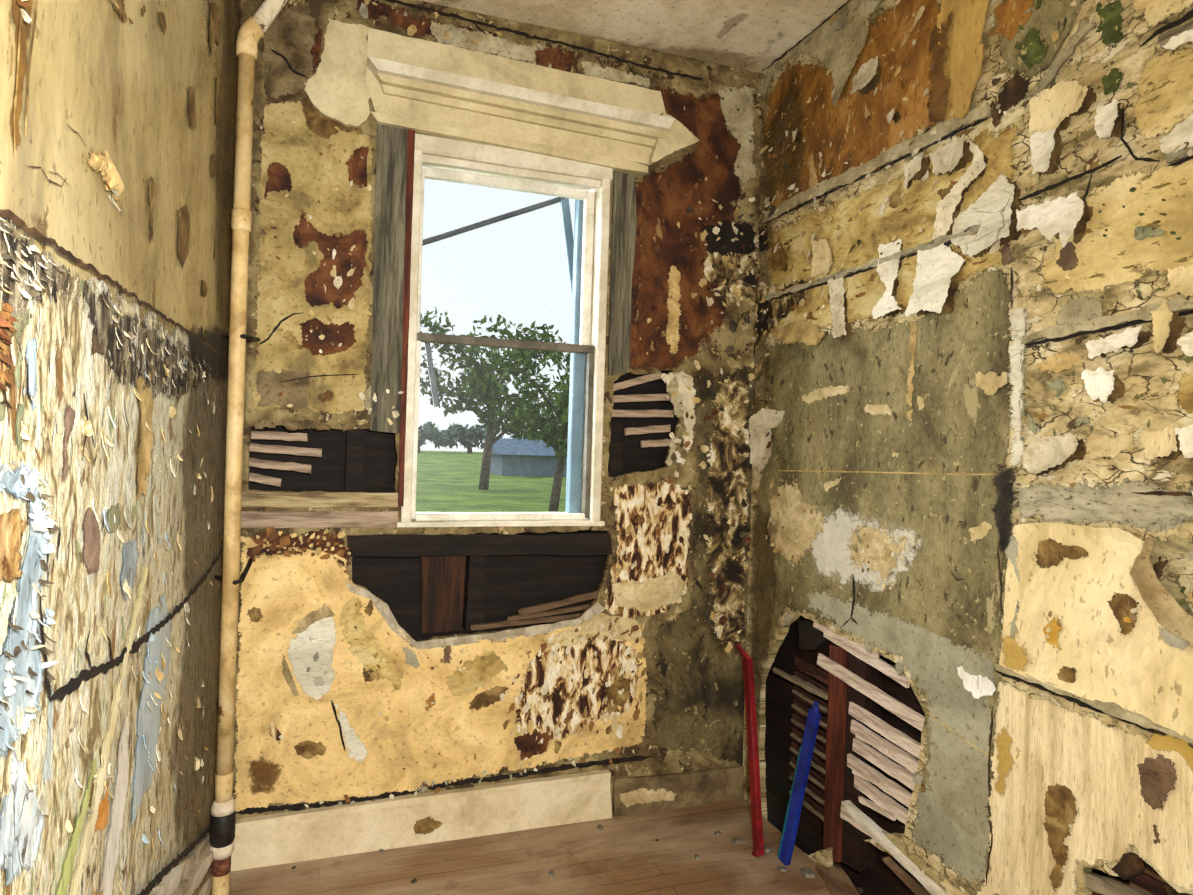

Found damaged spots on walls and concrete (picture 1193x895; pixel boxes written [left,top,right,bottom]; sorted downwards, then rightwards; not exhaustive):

spalling [147,177,157,243]
spalling [177,205,190,268]
leakage [0,0,263,844]
flaking render [234,0,1193,884]
peeling [0,255,216,895]
crack [40,547,223,701]
leakage [250,756,281,794]
flaking render [1085,852,1192,895]